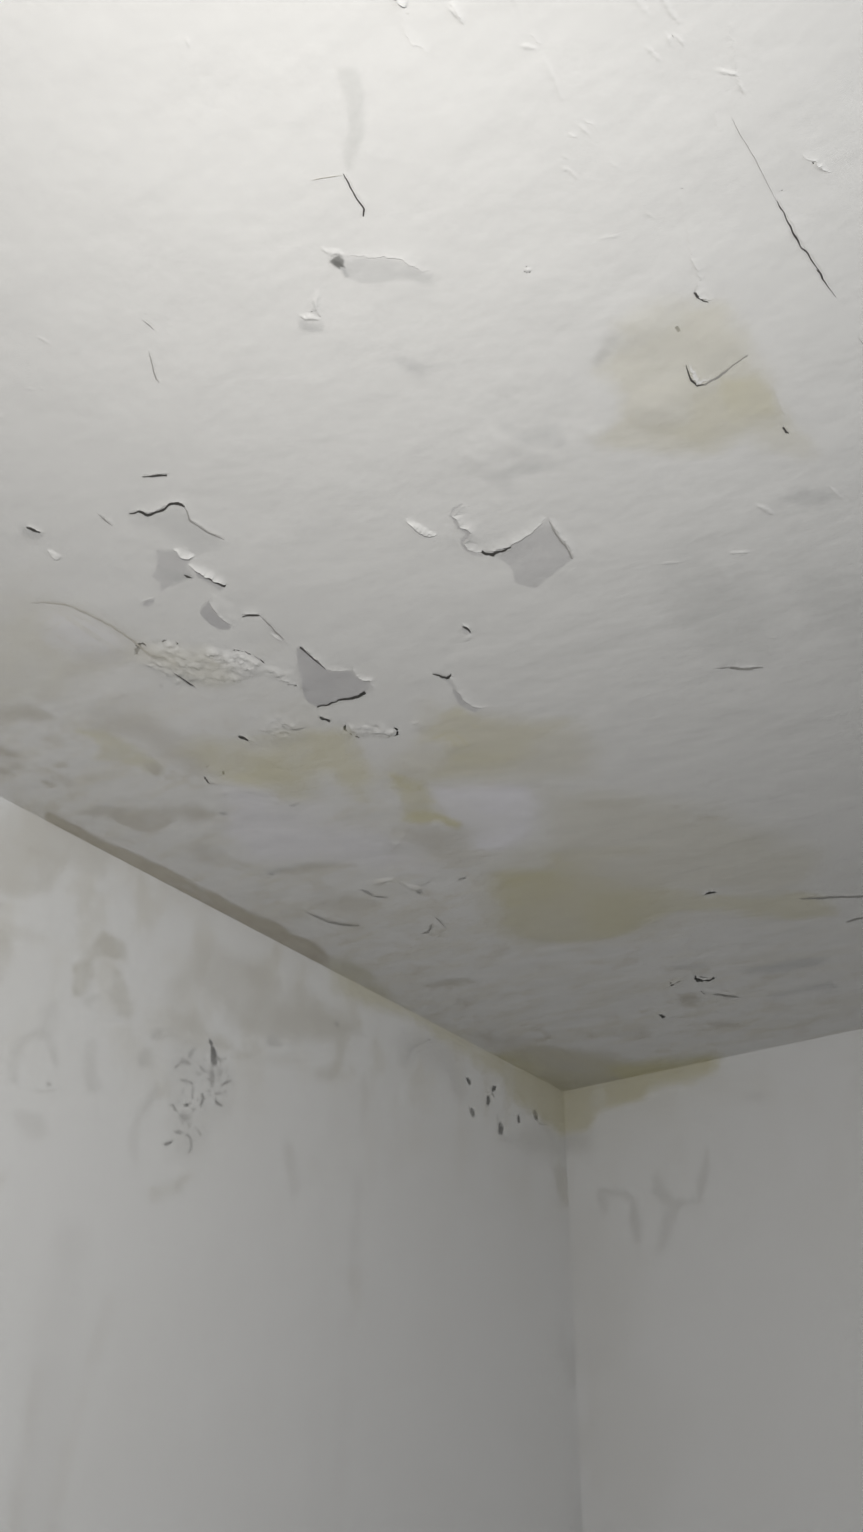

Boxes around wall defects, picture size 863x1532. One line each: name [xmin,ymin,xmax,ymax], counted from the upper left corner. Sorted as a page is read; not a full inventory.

crack [732,119,841,297]
spalling [318,237,432,277]
crack [98,466,226,540]
peeling [450,505,580,588]
peeling [132,546,400,743]
water stain [394,777,536,850]
water stain [493,854,661,941]
water stain [171,1039,228,1110]
water stain [499,1029,711,1091]
water stain [498,1109,547,1135]